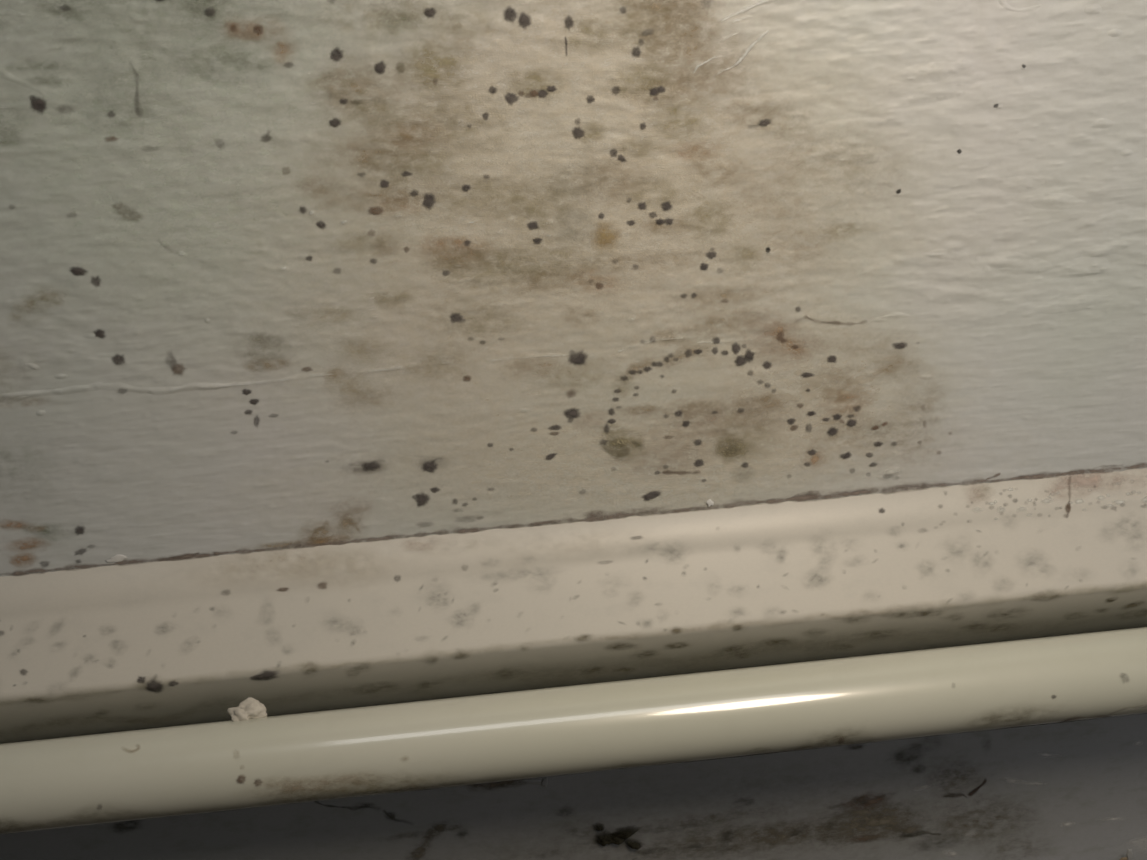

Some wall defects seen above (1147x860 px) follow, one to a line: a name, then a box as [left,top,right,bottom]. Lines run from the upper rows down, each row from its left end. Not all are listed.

damp [505,8,530,27]
damp [411,17,697,275]
damp [367,180,389,214]
damp [570,352,586,364]
damp [550,409,578,435]
damp [603,327,806,501]
damp [788,384,860,436]
damp [358,462,380,471]
damp [423,462,436,472]
damp [417,488,439,506]
damp [138,677,178,692]
damp [252,671,276,680]